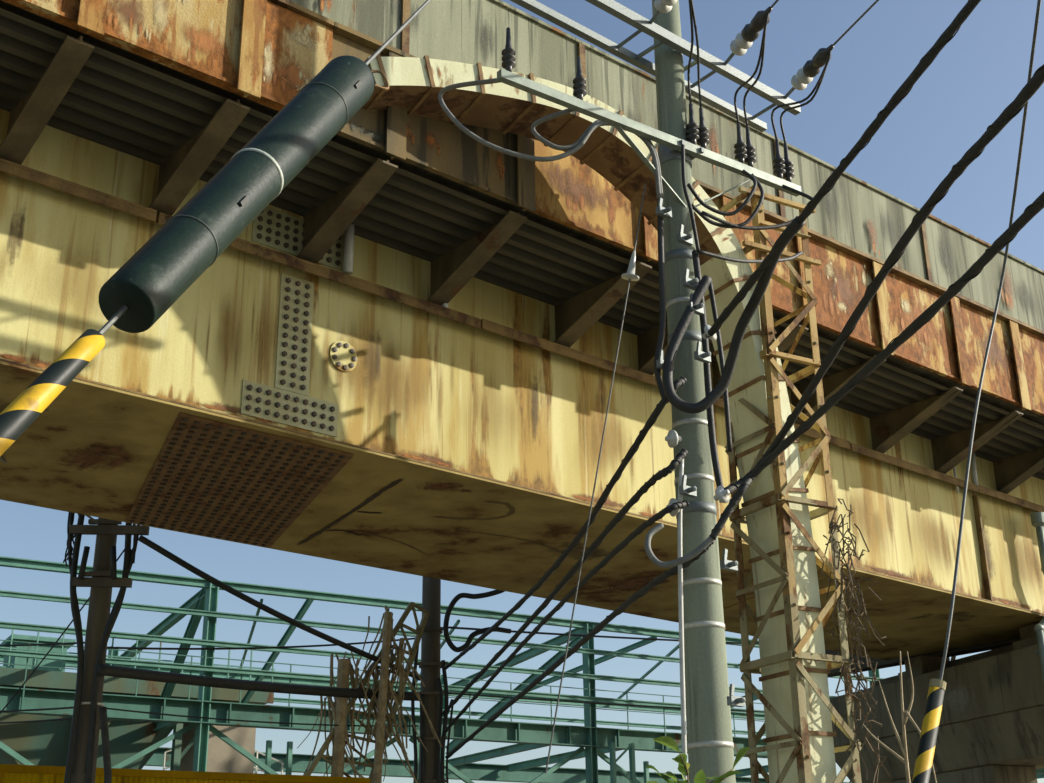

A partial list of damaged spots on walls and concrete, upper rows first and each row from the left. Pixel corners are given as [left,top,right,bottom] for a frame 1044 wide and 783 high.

corrosion [108,0,143,37]
corrosion [549,166,613,223]
corrosion [1001,268,1013,309]
corrosion [900,304,940,347]
corrosion [978,333,1011,381]
corrosion [401,453,452,467]
corrosion [871,567,912,580]